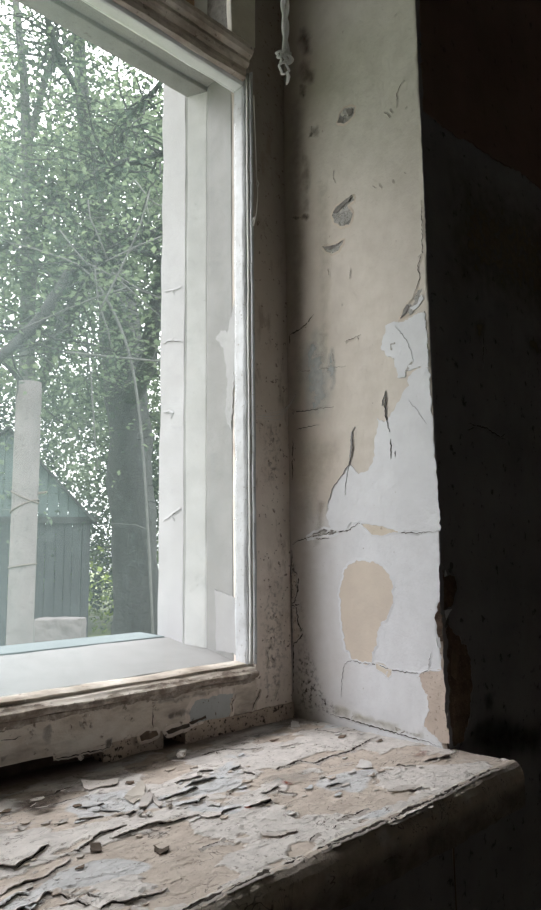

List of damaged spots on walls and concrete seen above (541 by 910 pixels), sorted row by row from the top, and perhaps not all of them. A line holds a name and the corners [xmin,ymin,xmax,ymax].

spalling [336,104,356,126]
spalling [321,194,356,256]
peeling [306,287,441,541]
crack [382,391,396,457]
crack [228,427,365,717]
crack [398,529,433,537]
spalling [0,557,475,910]
crack [192,637,441,771]